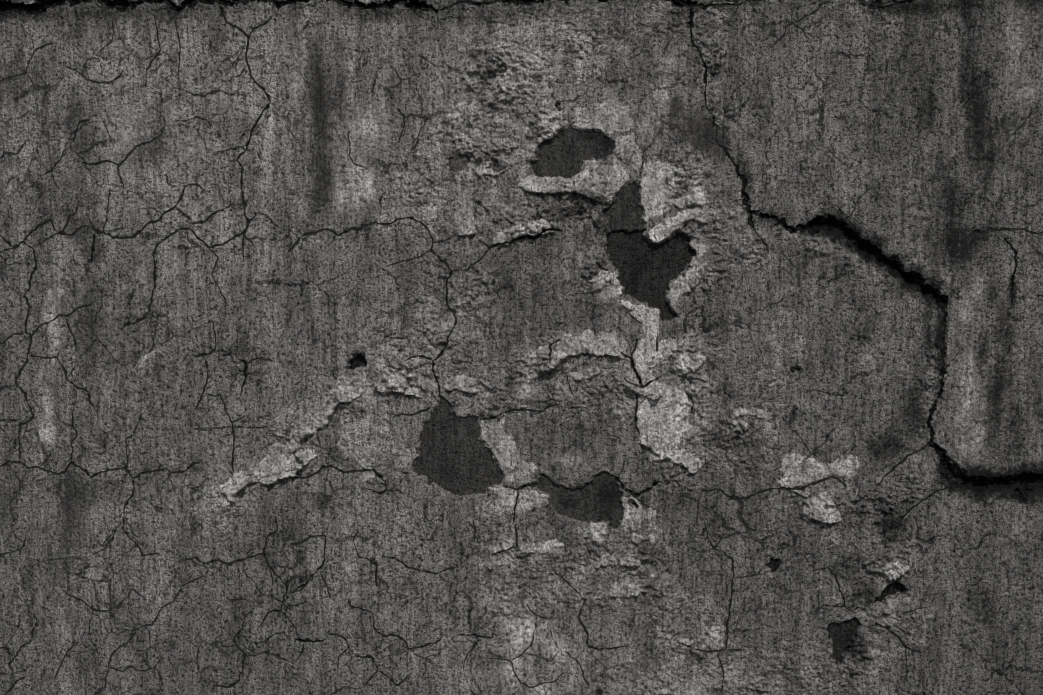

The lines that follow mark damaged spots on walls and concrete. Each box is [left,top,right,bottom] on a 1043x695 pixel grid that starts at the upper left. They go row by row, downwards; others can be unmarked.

flaking render [619,0,729,126]
crack [0,0,574,557]
crack [666,0,1043,523]
crack [0,612,37,695]
crack [53,483,627,695]
flaking render [189,103,958,695]
crack [615,459,660,508]
crack [621,335,662,436]
crack [676,476,851,689]
crack [875,606,930,683]